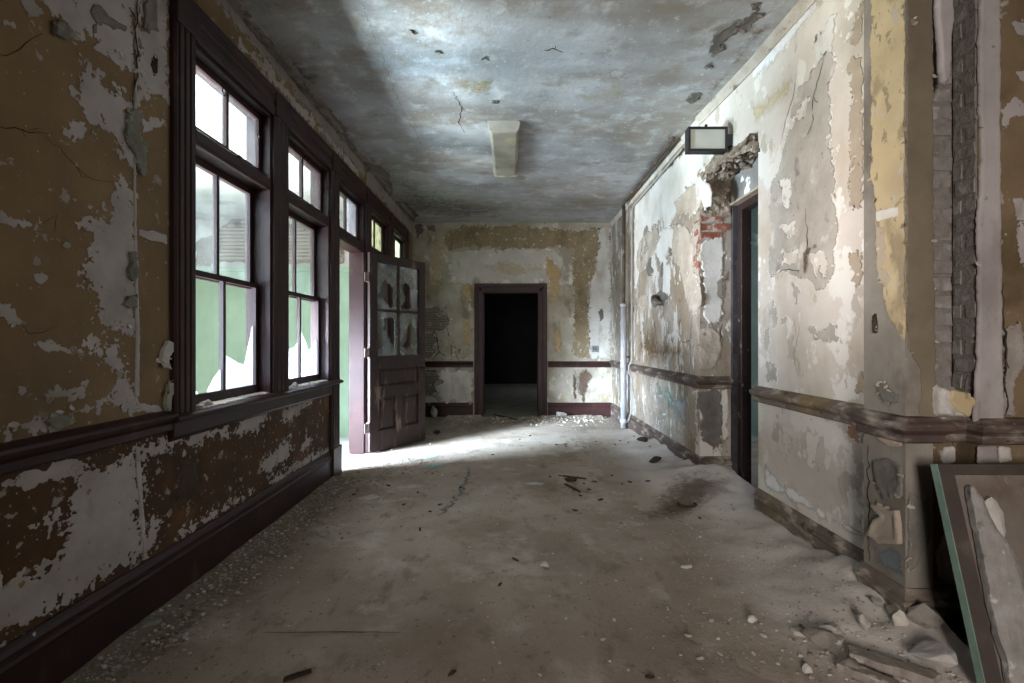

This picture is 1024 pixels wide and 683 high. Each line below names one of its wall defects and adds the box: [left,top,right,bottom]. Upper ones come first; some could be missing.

spalling [704,2,766,70]
peeling [0,0,174,443]
peeling [0,400,329,648]
peeling [215,0,612,361]
crack [437,466,470,516]
peeling [634,133,760,370]
spalling [695,389,729,447]
spalling [763,297,788,384]
peeling [767,0,1024,422]
spalling [866,437,955,579]